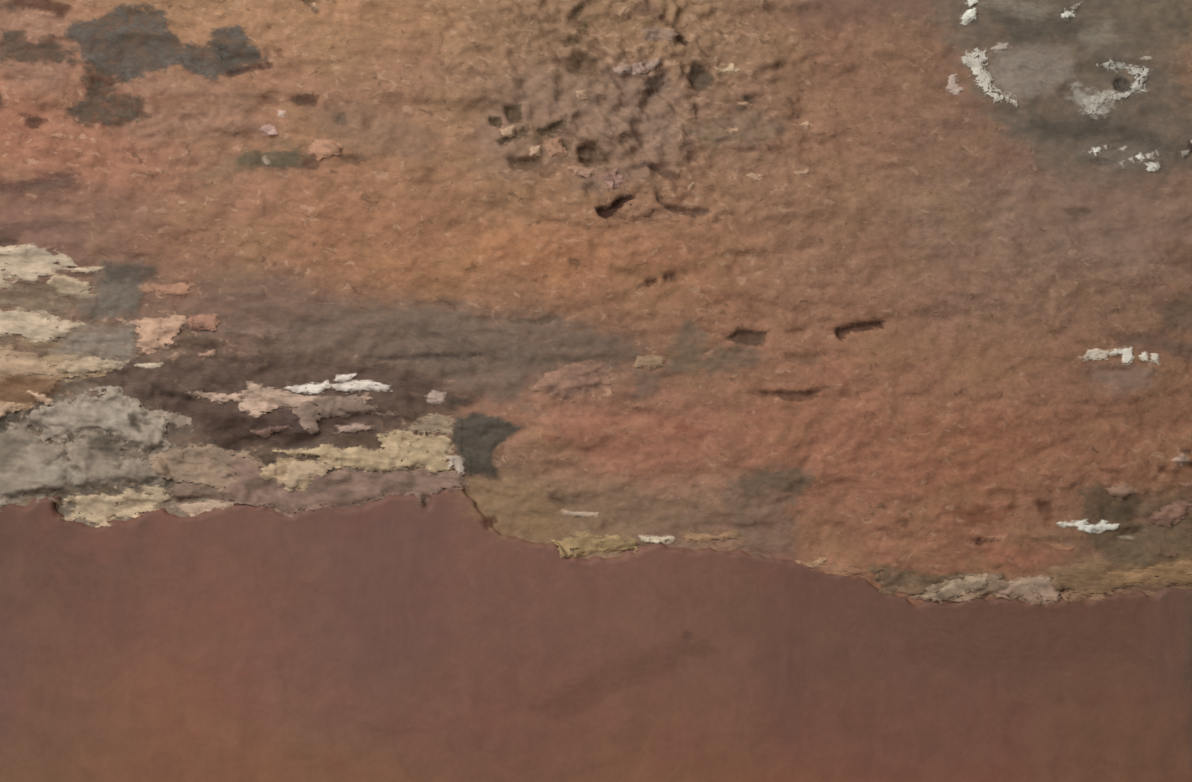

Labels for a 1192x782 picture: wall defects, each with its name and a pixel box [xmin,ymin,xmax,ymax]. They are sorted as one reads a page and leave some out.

mould [24,115,43,128]
mould [0,0,266,125]
water stain [946,0,1192,178]
spalling [0,0,1192,605]